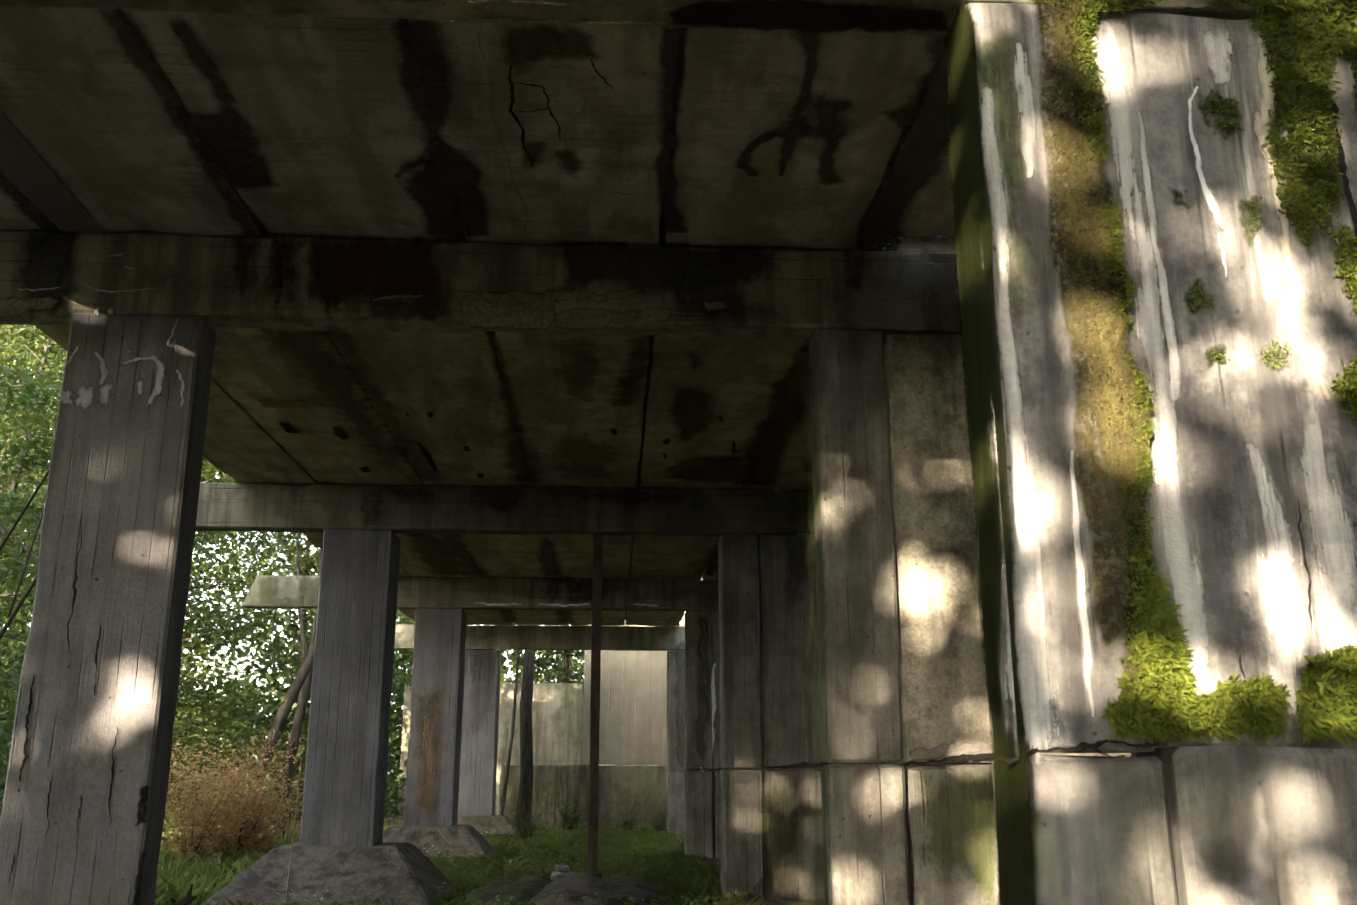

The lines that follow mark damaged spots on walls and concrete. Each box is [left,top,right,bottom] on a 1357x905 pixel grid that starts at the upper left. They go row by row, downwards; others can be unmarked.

leakage [104,13,277,235]
leakage [390,19,489,237]
crack [507,64,561,168]
crack [591,59,614,90]
leakage [1188,86,1227,277]
leakage [1203,32,1231,83]
leakage [1093,37,1210,689]
leakage [1255,38,1357,653]
crack [67,516,102,696]
leakage [1246,444,1303,713]
crack [19,676,118,839]
crack [892,739,1168,766]